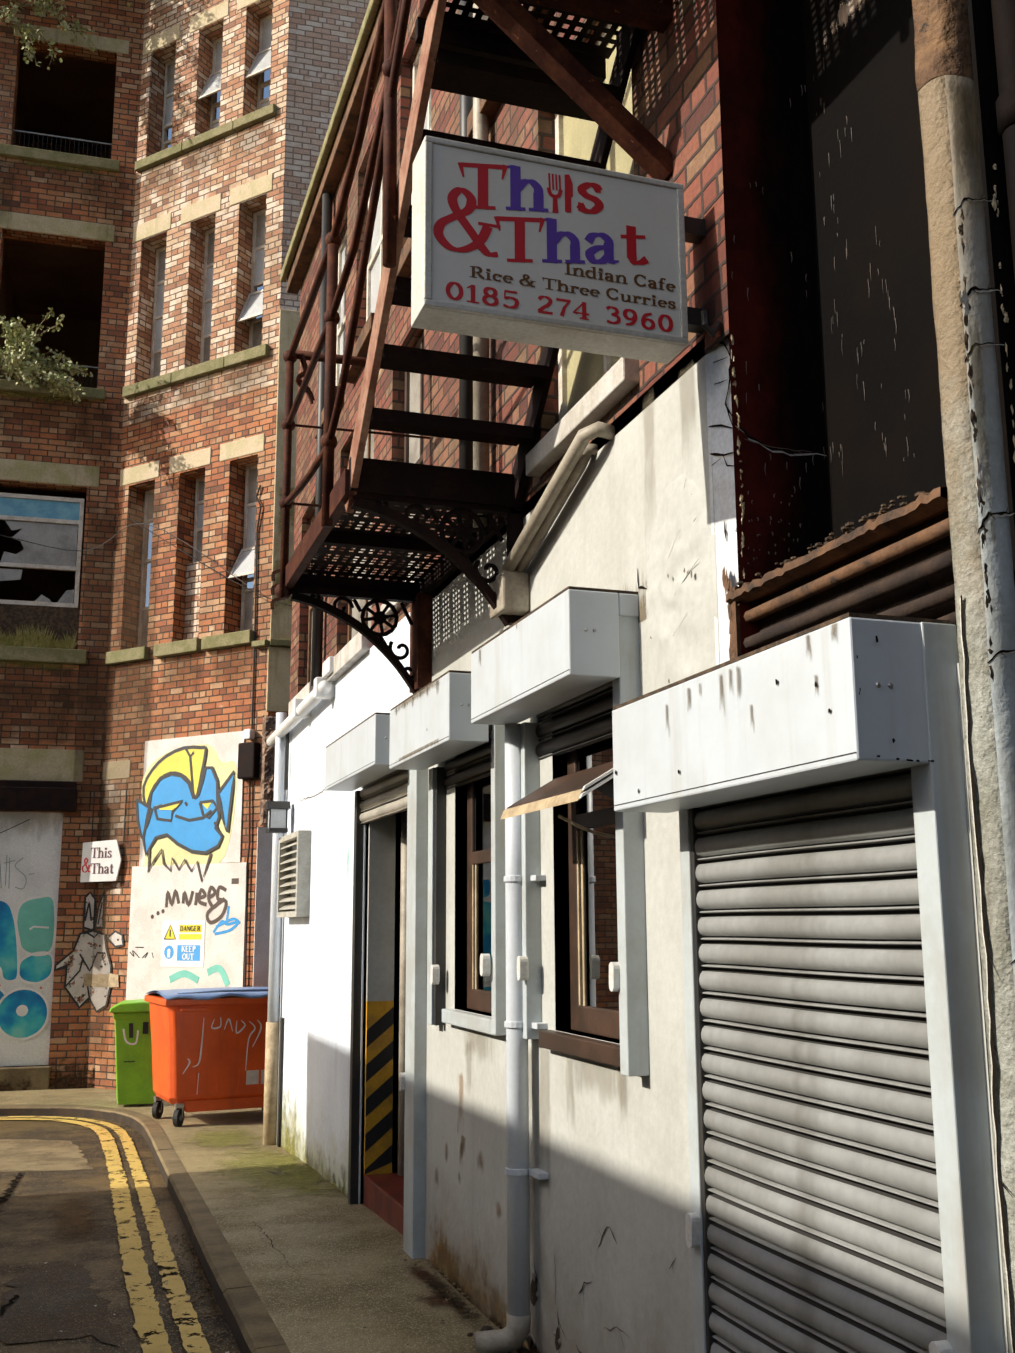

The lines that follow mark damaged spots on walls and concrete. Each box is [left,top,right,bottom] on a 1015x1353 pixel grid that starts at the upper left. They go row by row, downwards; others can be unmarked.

peeling [991,164,999,217]
peeling [959,276,993,614]
peeling [1005,342,1015,462]
peeling [722,335,745,660]
crack [0,1172,23,1212]
crack [0,1292,19,1315]
water stain [411,1239,507,1329]
crack [554,1254,630,1353]